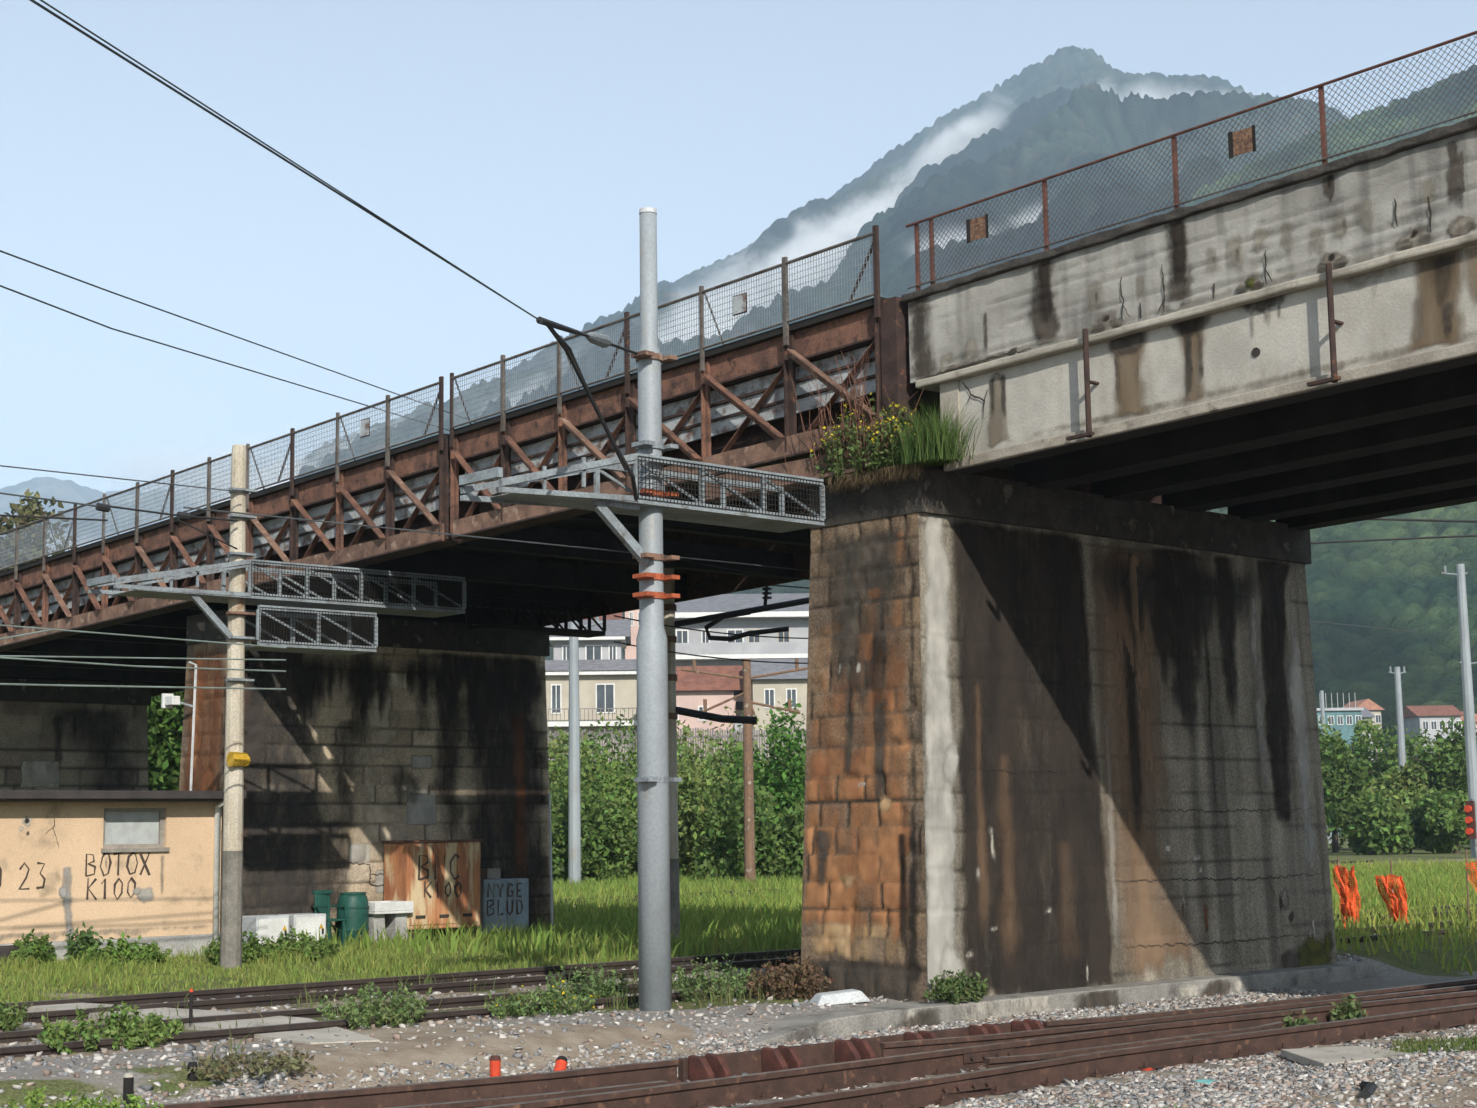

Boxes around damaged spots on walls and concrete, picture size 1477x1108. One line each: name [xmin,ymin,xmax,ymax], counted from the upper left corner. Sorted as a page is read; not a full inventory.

water stain [1422,141,1465,202]
water stain [1030,259,1060,344]
water stain [1165,219,1204,401]
water stain [1347,267,1396,286]
water stain [1410,248,1477,350]
water stain [1109,332,1144,416]
water stain [242,644,550,935]
corrosion [804,635,910,959]
water stain [953,522,1291,1009]